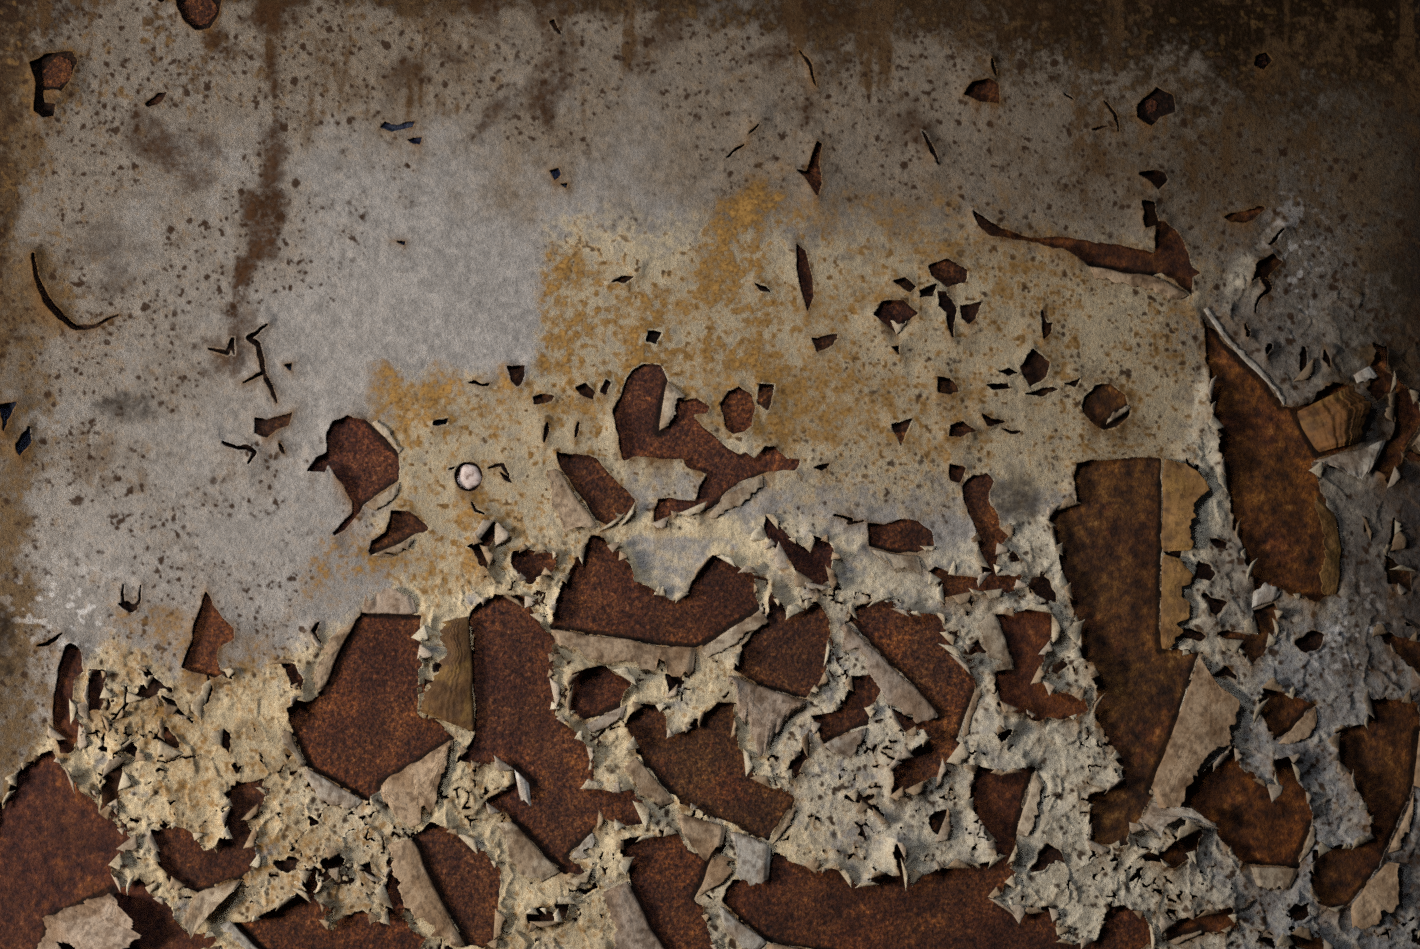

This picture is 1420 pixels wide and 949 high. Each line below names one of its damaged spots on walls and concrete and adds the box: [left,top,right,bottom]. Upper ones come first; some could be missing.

rust [248,0,300,32]
rust [528,21,566,120]
crack [31,253,119,330]
crack [208,323,277,403]
rust [372,180,985,466]
peeling [874,259,982,354]
peeling [973,170,1200,299]
crack [222,441,285,464]
peeling [307,415,429,557]
peeling [575,364,829,522]
peeling [1203,307,1420,664]
peeling [0,451,1420,949]